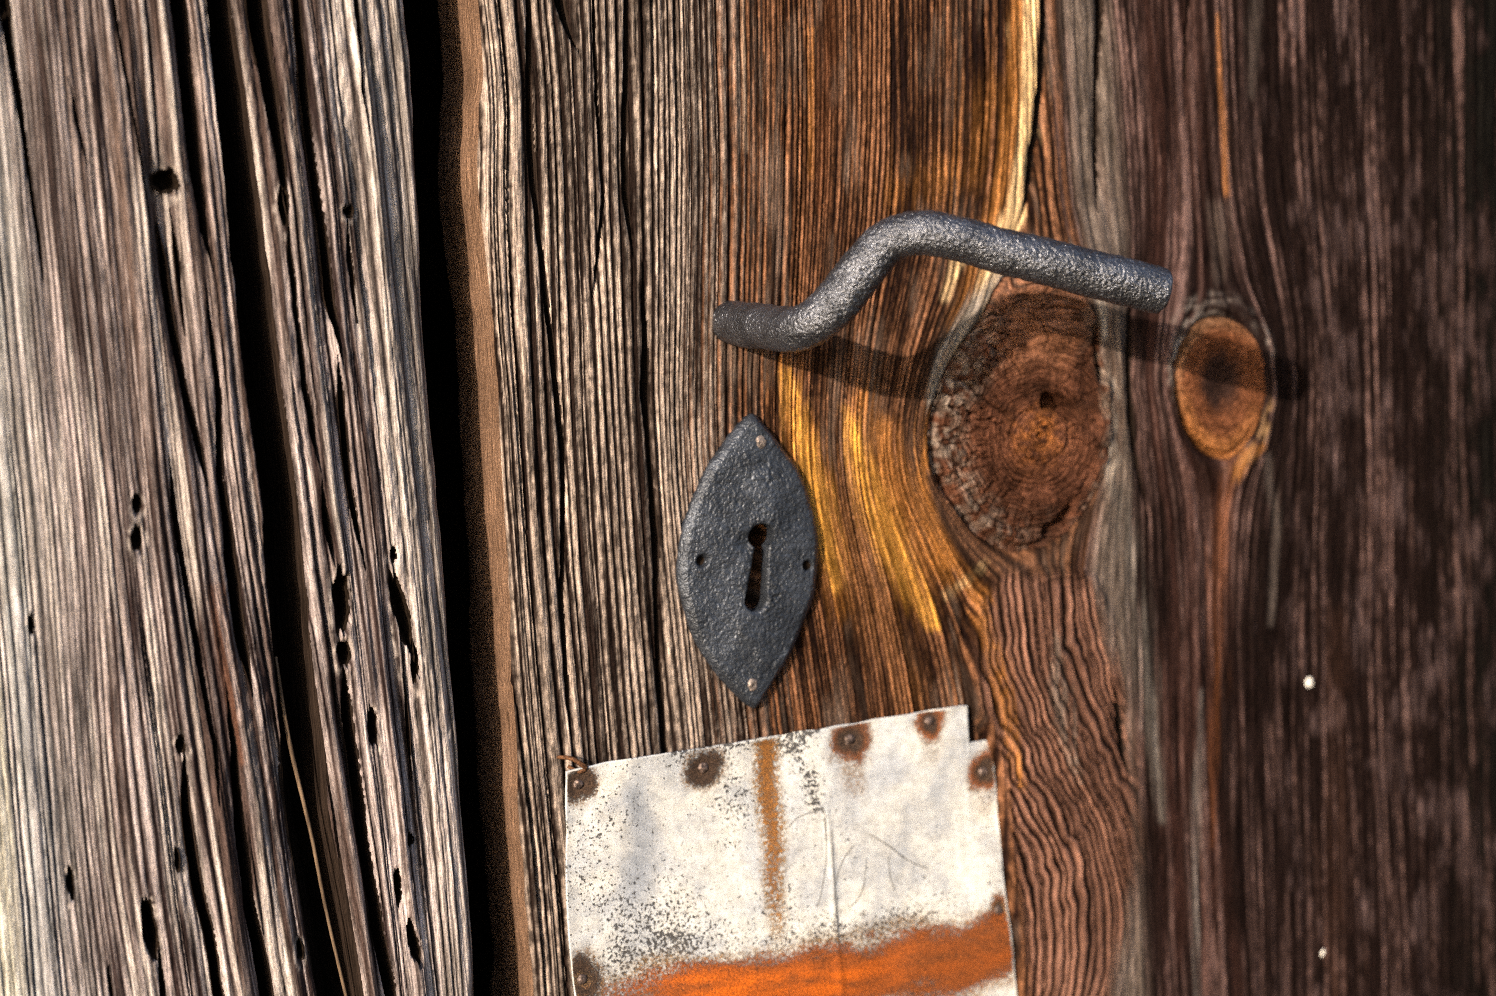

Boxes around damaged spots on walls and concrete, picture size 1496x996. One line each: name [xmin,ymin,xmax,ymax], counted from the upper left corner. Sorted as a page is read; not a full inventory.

corrosion [567,768,600,806]
corrosion [829,723,873,789]
corrosion [913,710,947,746]
corrosion [572,738,1014,996]